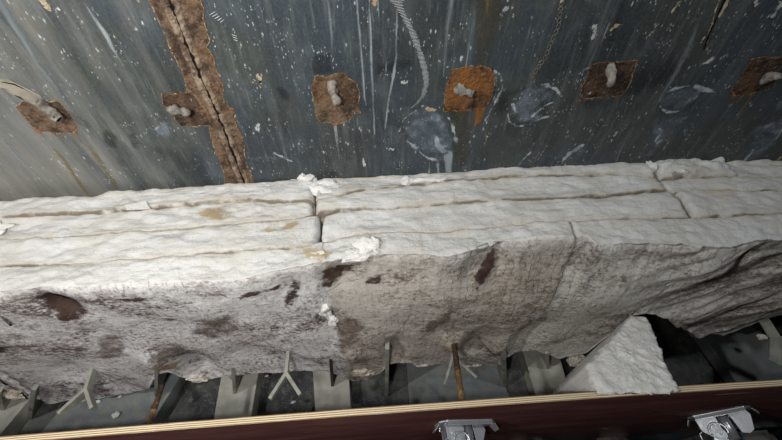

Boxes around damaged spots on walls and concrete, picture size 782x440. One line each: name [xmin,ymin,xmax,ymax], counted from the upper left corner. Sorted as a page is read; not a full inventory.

peeling [0,79,44,105]
corrosion [15,100,78,136]
corrosion [149,0,255,184]
corrosion [311,72,361,125]
corrosion [443,65,495,126]
corrosion [579,60,637,99]
corrosion [731,56,782,113]
damp [474,248,495,289]
damp [36,293,90,321]